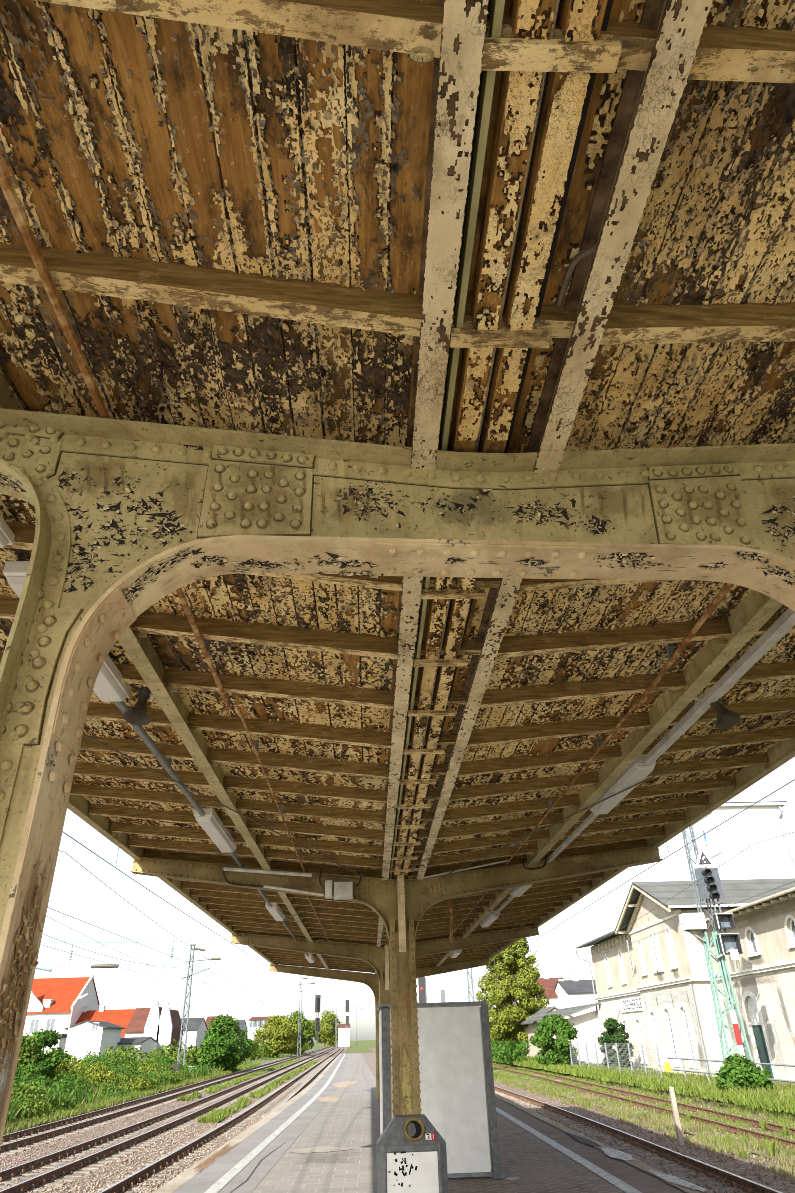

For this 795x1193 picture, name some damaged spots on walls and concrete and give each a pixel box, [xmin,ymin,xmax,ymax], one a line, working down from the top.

peeling [0,0,489,470]
peeling [457,0,795,473]
peeling [0,618,13,652]
peeling [0,547,32,598]
peeling [55,463,795,881]
peeling [376,917,384,947]